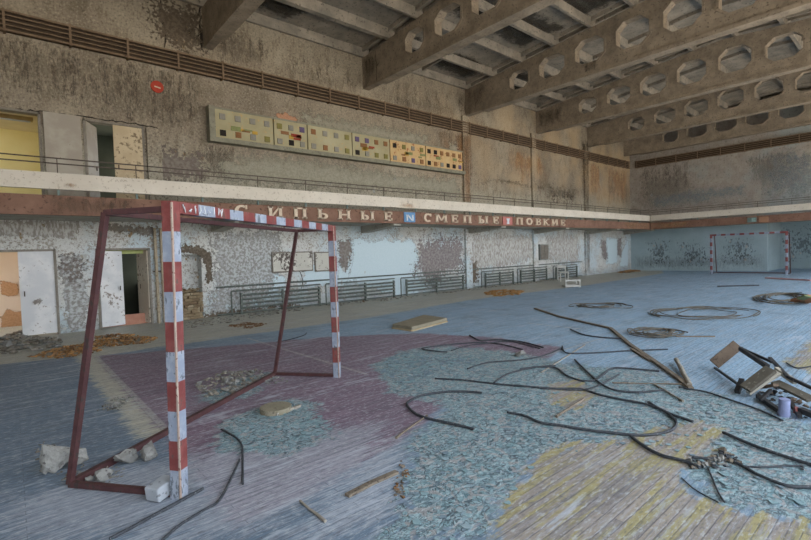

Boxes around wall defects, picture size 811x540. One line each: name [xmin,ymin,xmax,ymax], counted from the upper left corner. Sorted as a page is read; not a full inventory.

peeling [58,253,92,332]
peeling [181,227,300,318]
peeling [303,229,533,296]